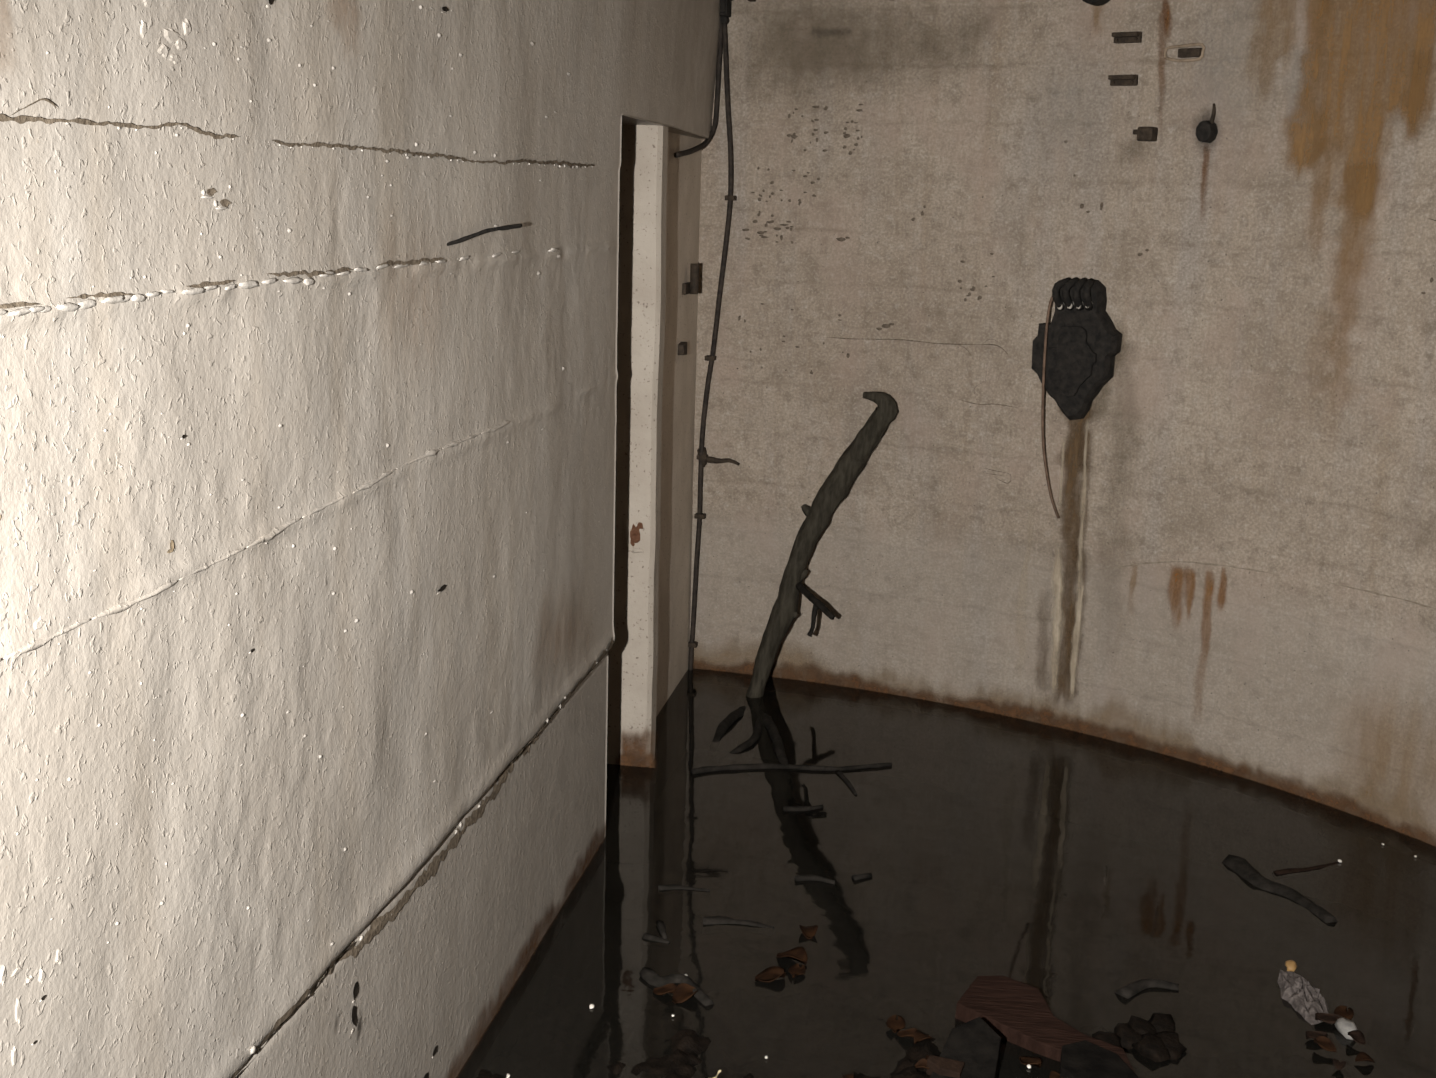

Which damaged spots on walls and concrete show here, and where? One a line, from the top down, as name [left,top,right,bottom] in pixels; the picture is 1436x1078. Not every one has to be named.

crack [0,98,595,168]
leakage [693,387,1436,847]
rust [1170,569,1226,616]